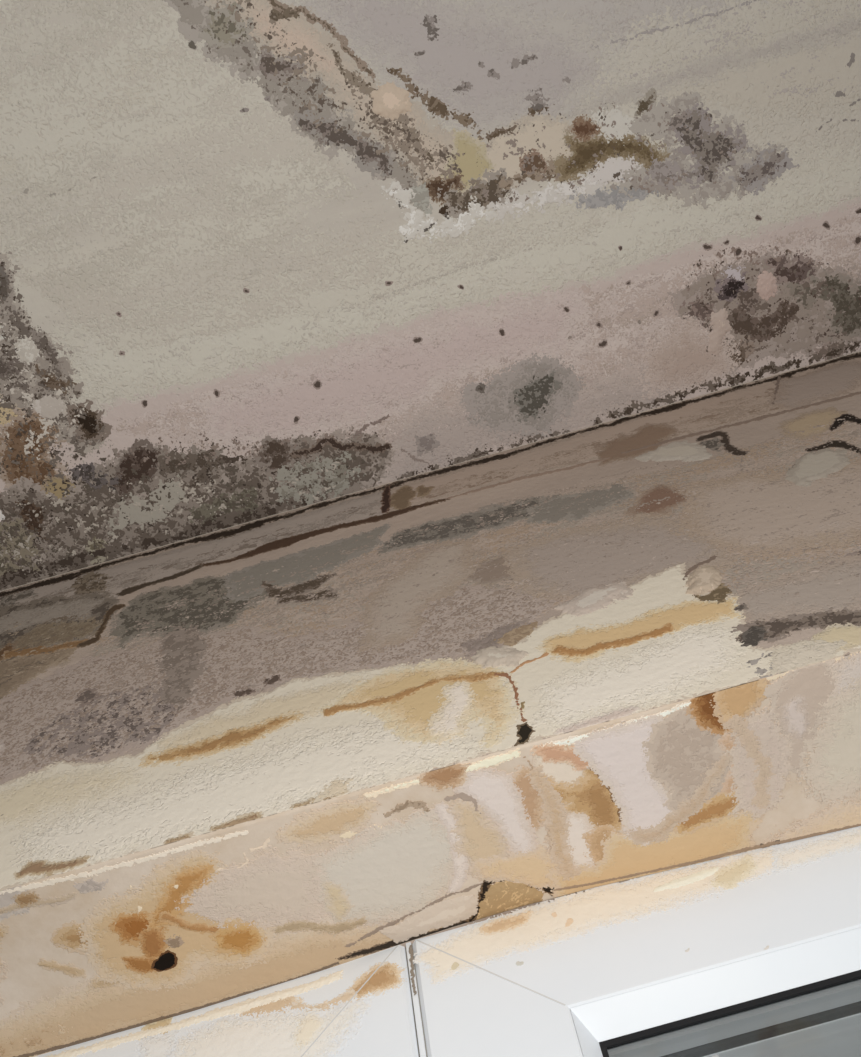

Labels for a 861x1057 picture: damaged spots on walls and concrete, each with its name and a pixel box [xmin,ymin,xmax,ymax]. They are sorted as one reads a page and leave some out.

damp [0,0,861,244]
crack [0,352,861,648]
corrosion [108,860,267,975]
peeling [0,660,436,895]
corrosion [138,709,306,768]
corrosion [323,670,509,716]
damp [0,239,861,1057]
crack [13,824,861,1057]
peeling [379,880,544,944]
crack [494,652,549,722]
corrosion [512,741,624,867]
peeling [348,562,861,799]